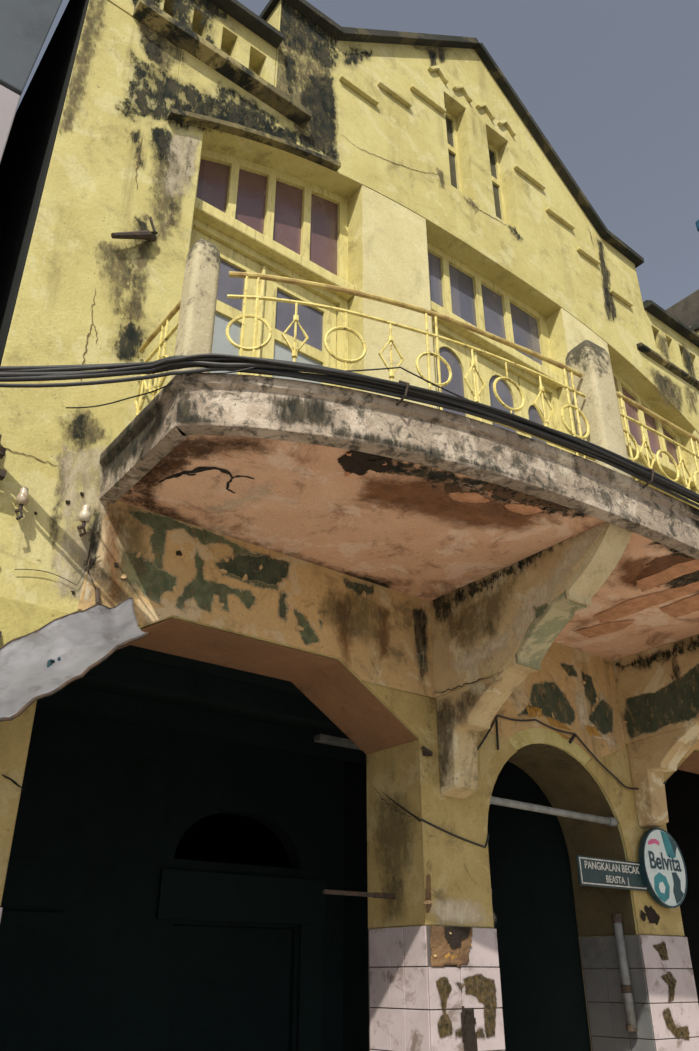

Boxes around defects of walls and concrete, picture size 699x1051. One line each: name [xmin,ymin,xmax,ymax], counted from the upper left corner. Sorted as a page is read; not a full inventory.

leakage [99,0,372,363]
crack [341,134,438,175]
leakage [597,239,616,321]
crack [81,288,98,380]
crack [160,467,254,493]
spalling [337,450,393,477]
leakage [269,395,587,529]
peeling [114,510,323,645]
leakage [275,550,390,588]
leakage [410,527,603,678]
peeling [518,663,699,740]
peeling [640,906,660,925]